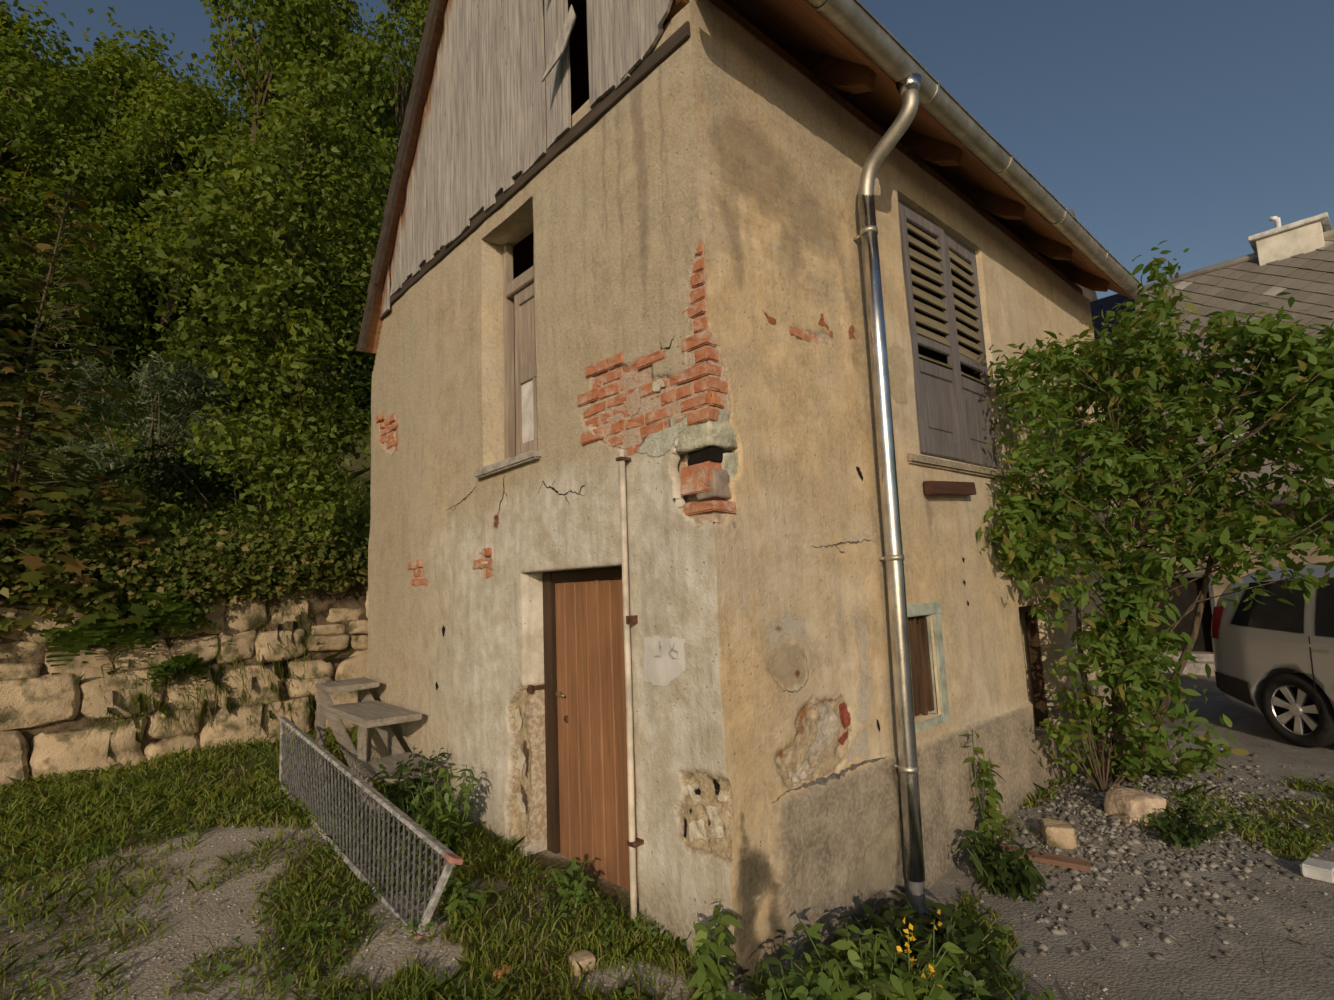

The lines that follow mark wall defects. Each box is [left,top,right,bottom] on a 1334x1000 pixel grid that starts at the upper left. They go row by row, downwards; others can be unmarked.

spalling [765,313,833,344]
spalling [577,242,739,528]
crack [447,476,507,513]
crack [539,480,585,503]
spalling [472,548,495,578]
crack [813,533,875,554]
spalling [509,689,531,842]
spalling [771,652,885,804]
peeling [681,772,733,859]
water stain [734,837,784,986]